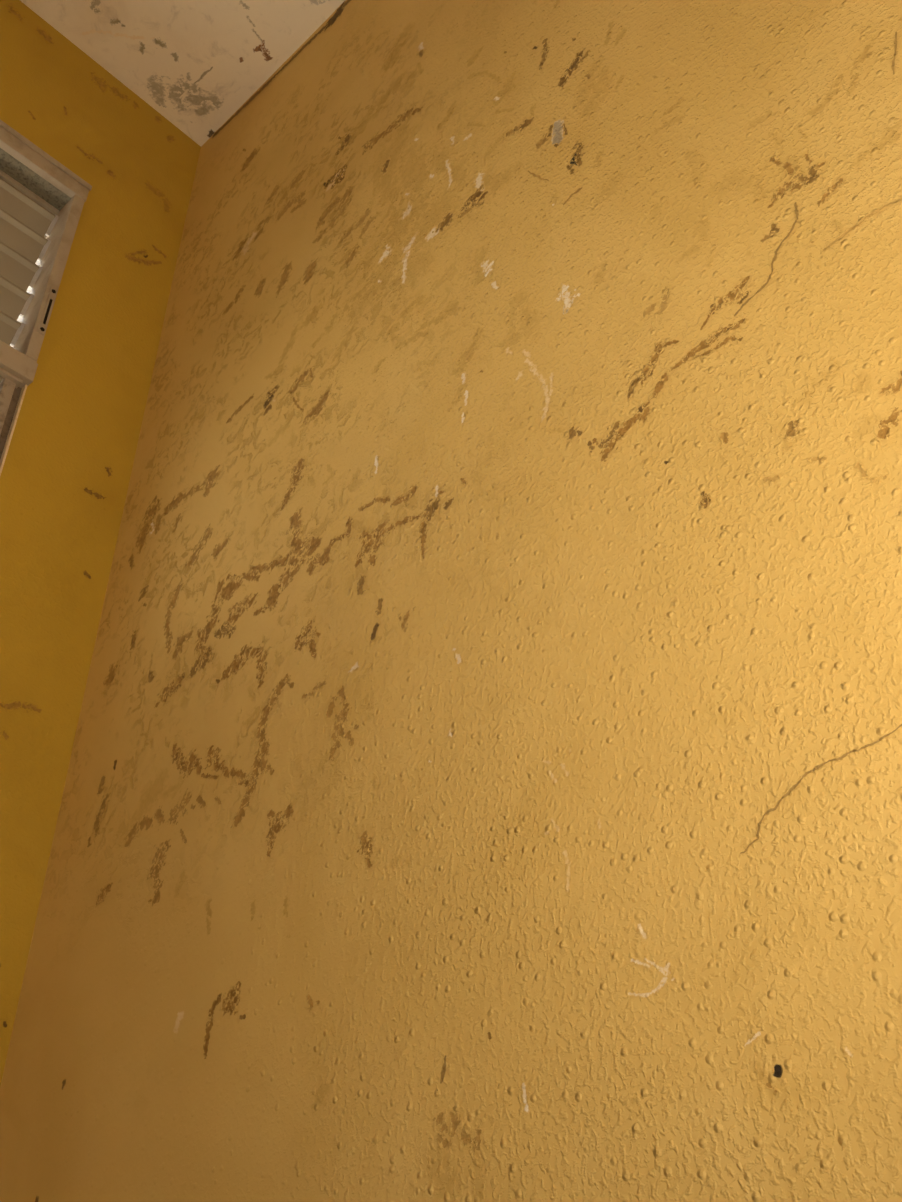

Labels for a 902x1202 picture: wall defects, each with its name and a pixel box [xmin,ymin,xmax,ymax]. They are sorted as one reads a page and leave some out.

water stain [138,36,225,138]
crack [734,202,799,316]
crack [823,198,902,251]
peeling [226,367,334,453]
peeling [123,456,456,907]
peeling [87,759,118,848]
crack [741,723,902,853]